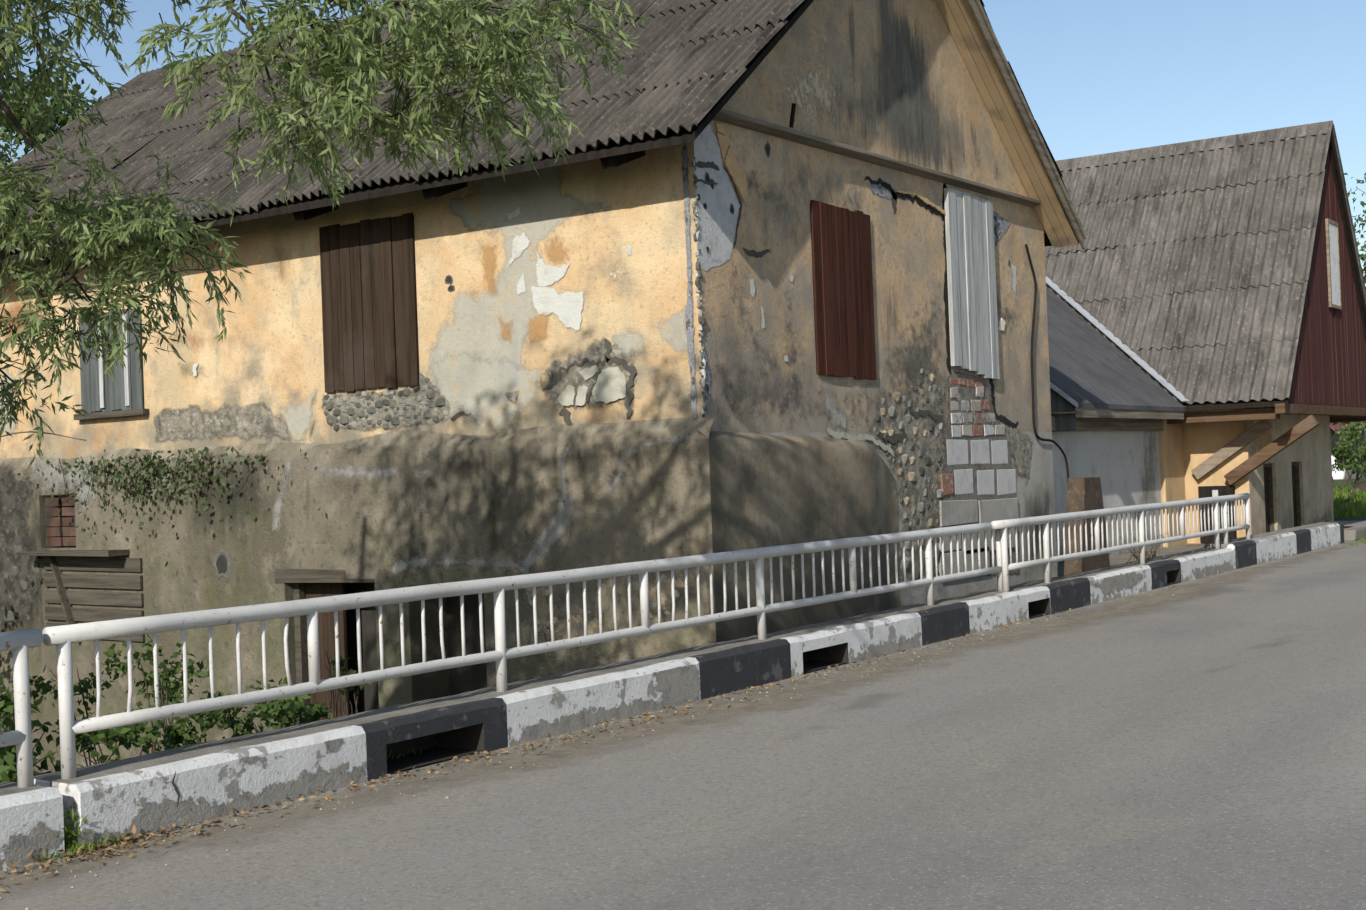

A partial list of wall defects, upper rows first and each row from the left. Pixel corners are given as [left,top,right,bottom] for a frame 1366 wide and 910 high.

damp [878,0,957,171]
peeling [154,165,643,442]
peeling [657,123,747,419]
crack [864,176,951,375]
flaking render [825,367,1032,582]
crack [989,379,1018,428]
peeling [1,738,366,868]
peeling [509,665,701,747]